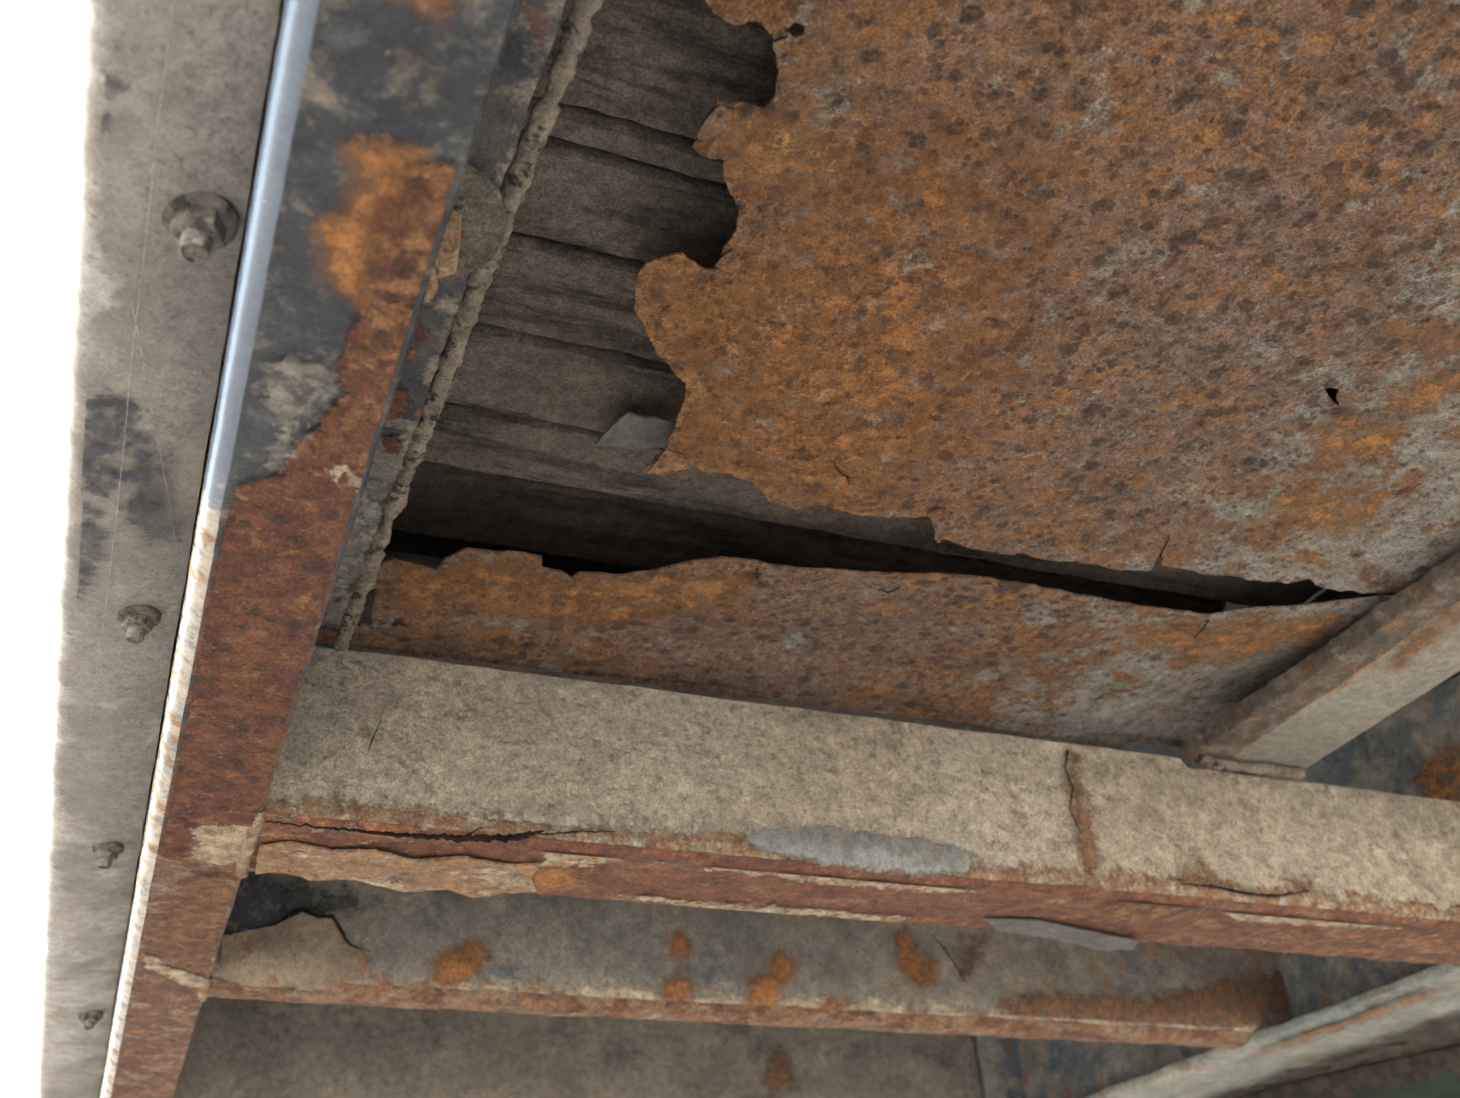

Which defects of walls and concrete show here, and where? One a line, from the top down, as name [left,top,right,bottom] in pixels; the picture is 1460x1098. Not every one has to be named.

peeling [697,105,735,142]
peeling [715,249,741,276]
peeling [647,448,690,476]
rust [1273,372,1460,535]
rust [161,137,457,858]
rust [383,555,751,623]
rust [1126,611,1352,666]
rust [1413,743,1460,801]
crack [265,820,616,843]
rust [163,875,236,971]
peeling [141,822,540,991]
rust [432,940,490,989]